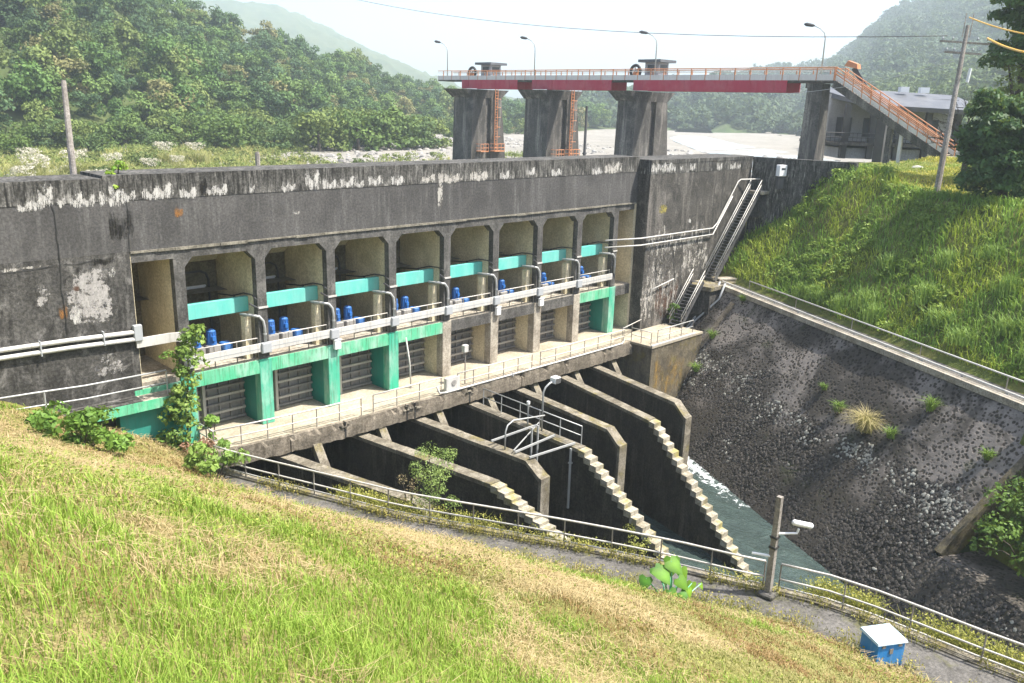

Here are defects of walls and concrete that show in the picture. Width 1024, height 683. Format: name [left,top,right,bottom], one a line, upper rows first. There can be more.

water stain [108,211,134,239]
crack [1,201,90,335]
spalling [67,267,114,325]